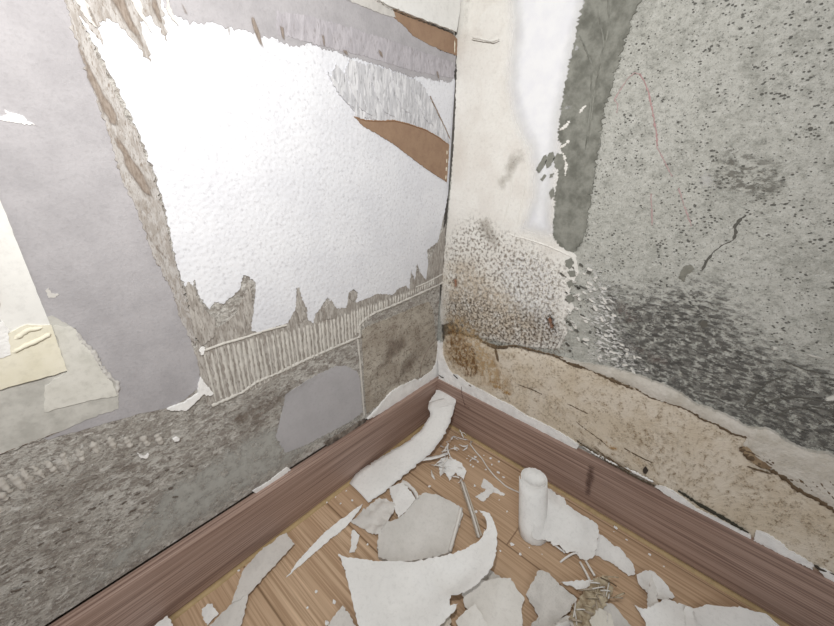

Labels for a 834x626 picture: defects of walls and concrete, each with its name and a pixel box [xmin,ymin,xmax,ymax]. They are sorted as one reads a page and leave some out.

peeling [80,0,455,332]
leakage [446,223,563,350]
crack [701,215,747,271]
peeling [166,377,213,411]
spalling [276,302,438,453]
peeling [558,263,834,509]
leakage [588,270,834,452]
peeling [252,467,291,493]
peeling [475,478,505,502]